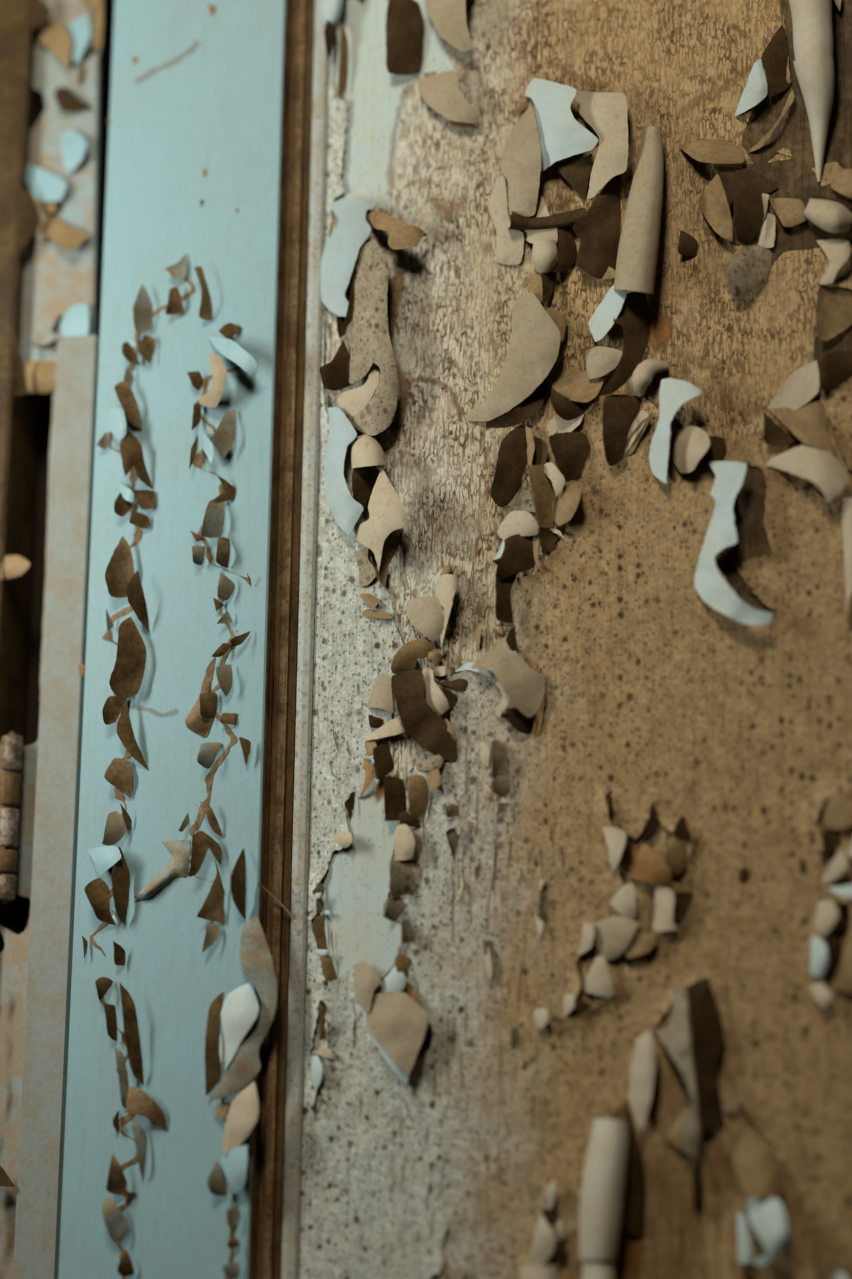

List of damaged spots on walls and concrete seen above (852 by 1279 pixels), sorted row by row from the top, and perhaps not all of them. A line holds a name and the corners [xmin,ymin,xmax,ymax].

peeling [12,0,111,395]
peeling [0,555,30,580]
peeling [311,0,852,1085]
peeling [82,253,277,1279]
peeling [0,1166,15,1187]
peeling [310,1001,335,1124]
peeling [430,1228,466,1279]
peeling [520,978,788,1279]